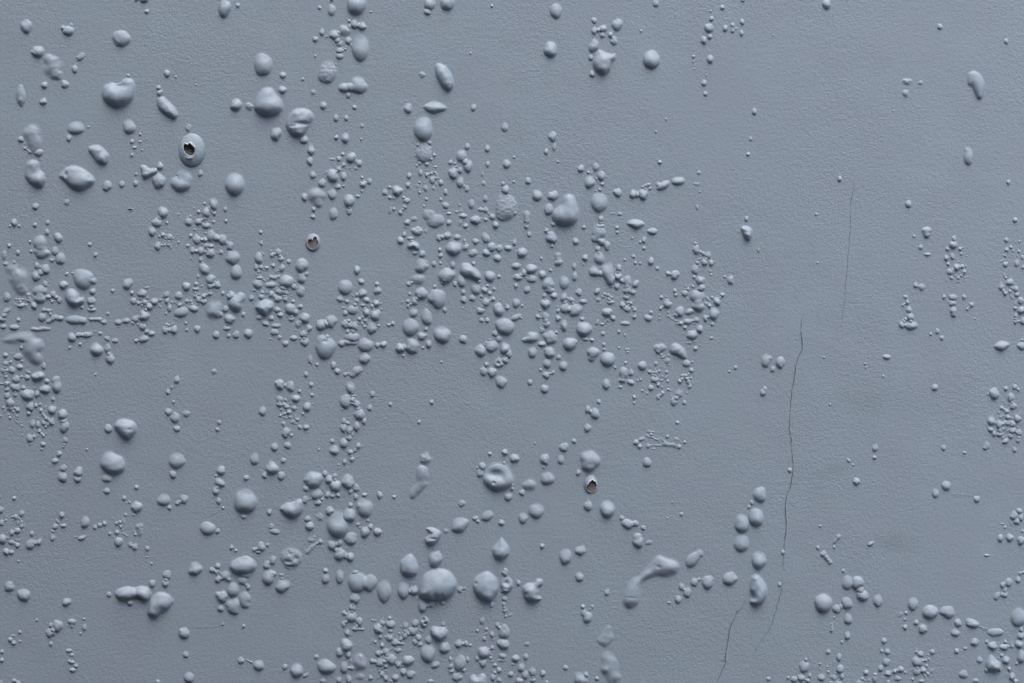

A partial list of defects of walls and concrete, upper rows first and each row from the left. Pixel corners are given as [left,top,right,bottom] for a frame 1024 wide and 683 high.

crack [841,180,855,326]
crack [718,317,804,680]